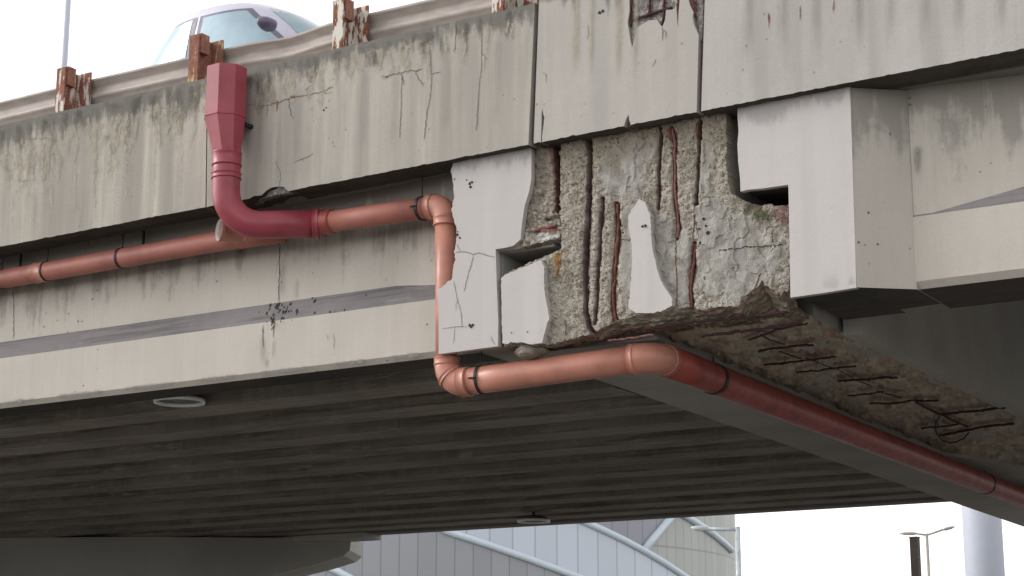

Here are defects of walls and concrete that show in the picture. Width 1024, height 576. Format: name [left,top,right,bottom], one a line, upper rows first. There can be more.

spalling [629,0,704,42]
crack [250,86,332,118]
crack [384,28,457,138]
crack [406,245,493,343]
spalling [501,113,1024,463]